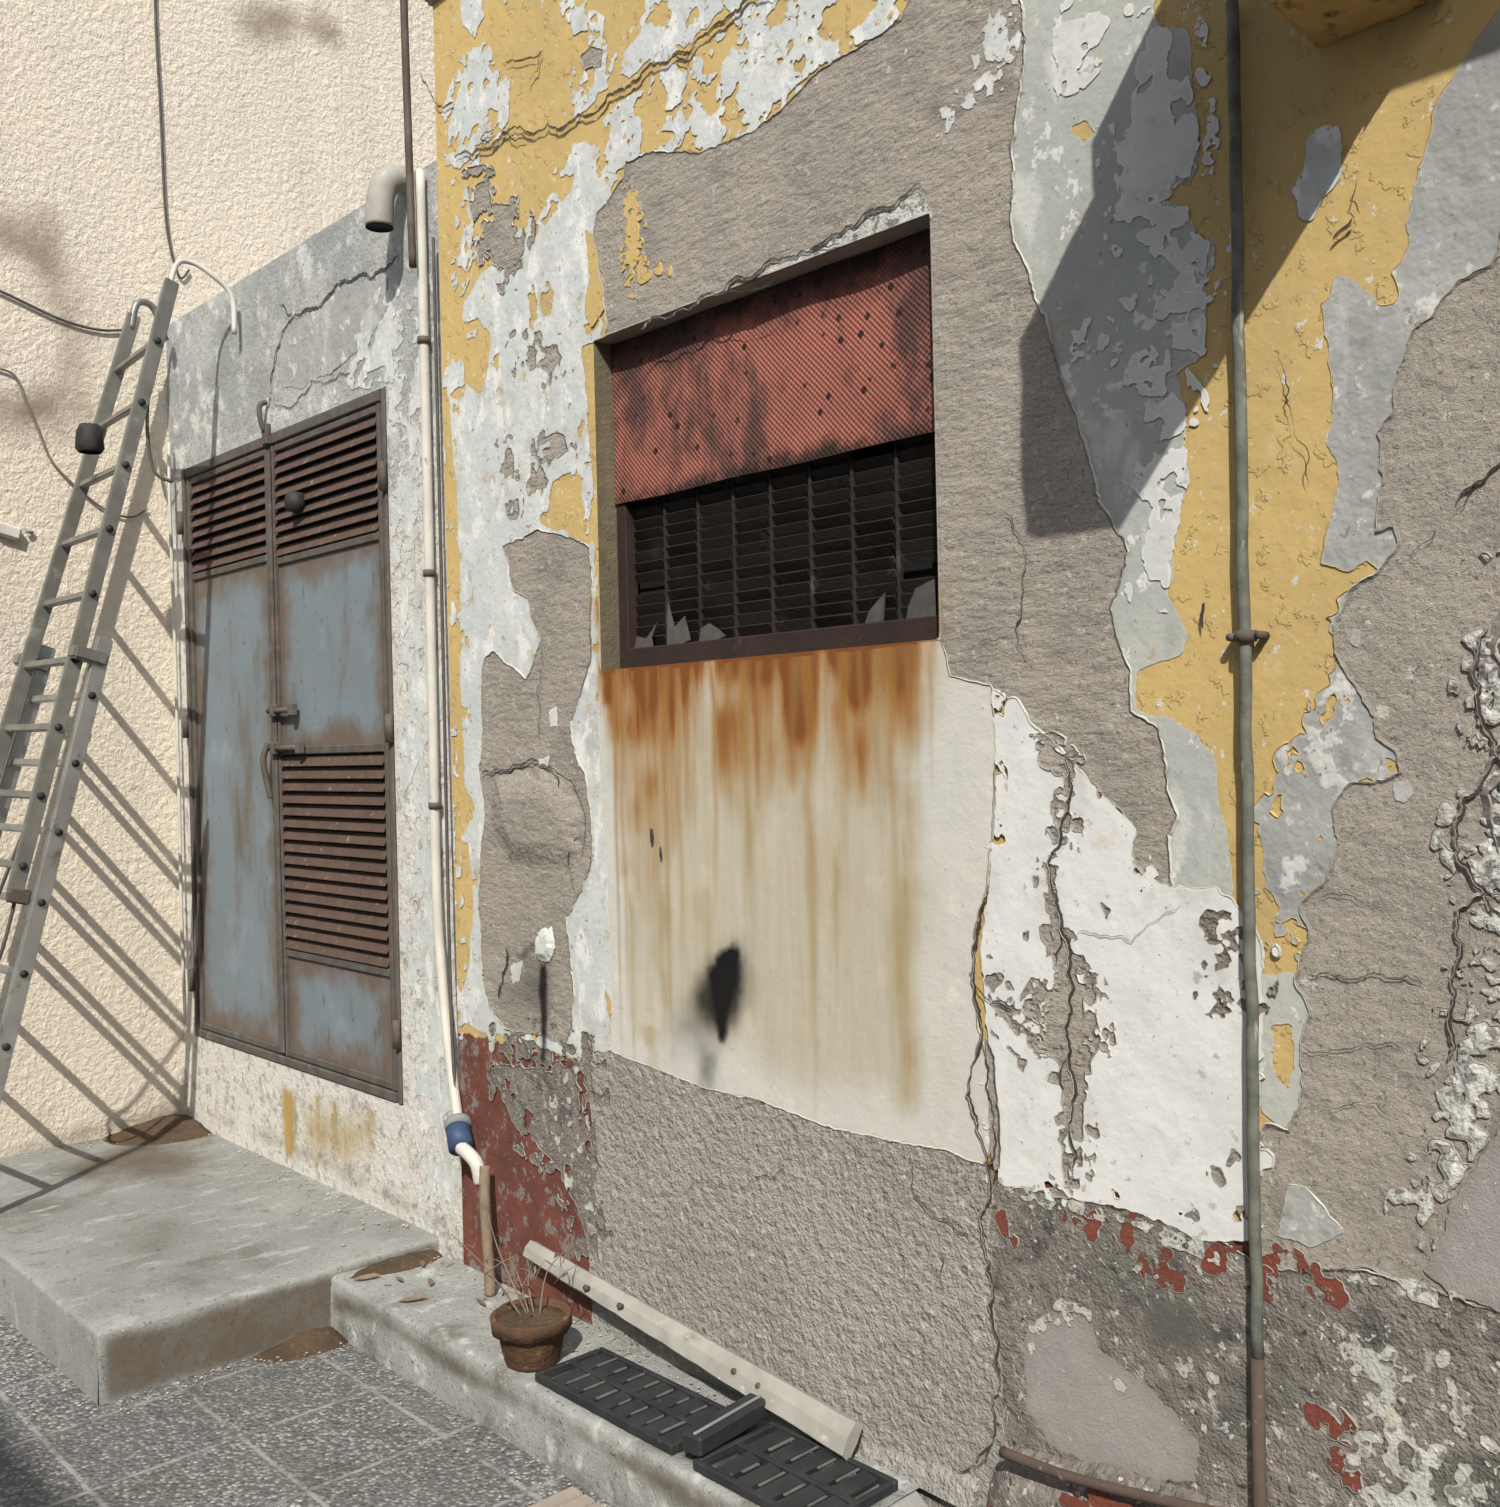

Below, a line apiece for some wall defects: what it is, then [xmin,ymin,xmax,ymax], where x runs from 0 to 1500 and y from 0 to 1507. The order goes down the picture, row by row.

crack [421,74,453,109]
crack [454,0,758,158]
crack [268,255,398,409]
crack [1409,461,1500,556]
corrosion [598,641,923,827]
flaking render [319,0,1500,1507]
crack [1299,628,1500,1060]
crack [1310,1102,1390,1116]